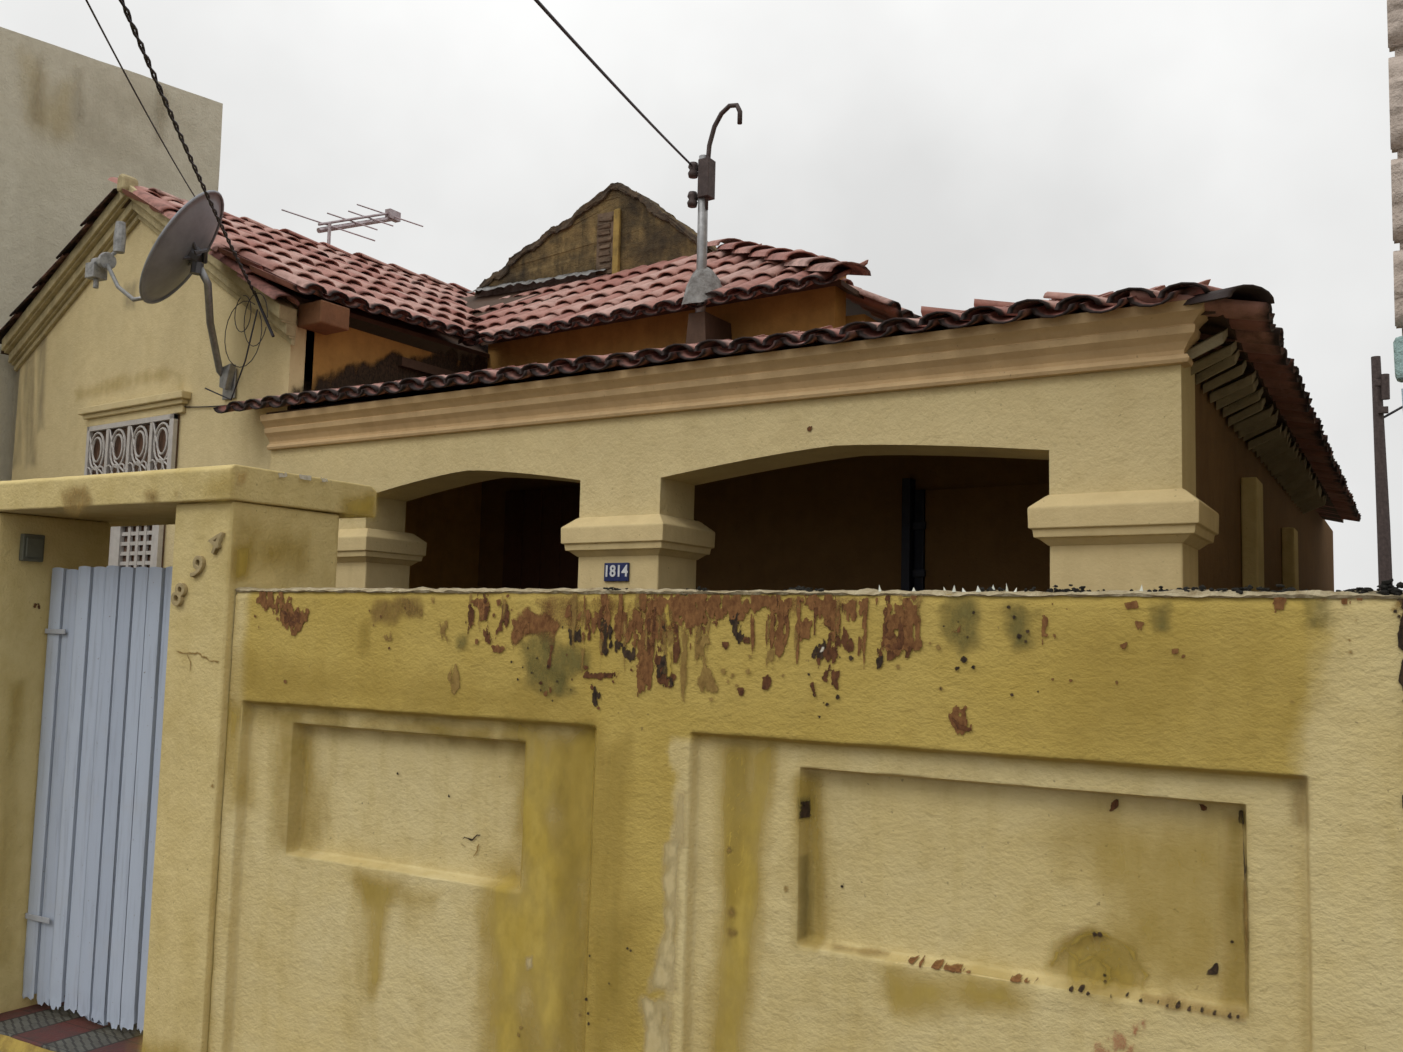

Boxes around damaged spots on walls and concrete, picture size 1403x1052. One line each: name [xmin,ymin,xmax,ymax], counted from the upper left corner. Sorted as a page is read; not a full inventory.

crack [177,651,218,669]
peeling [254,591,309,636]
peeling [465,593,941,718]
spalling [948,705,972,735]
damp [361,880,388,986]
damp [714,747,772,1052]